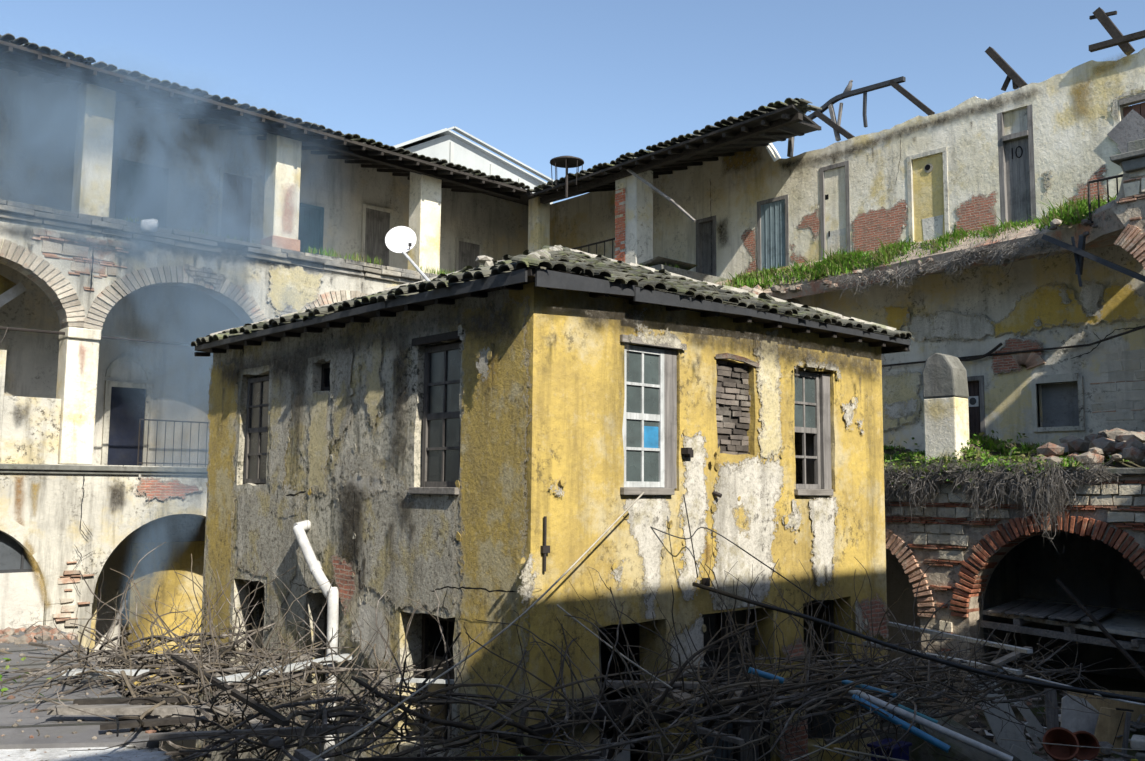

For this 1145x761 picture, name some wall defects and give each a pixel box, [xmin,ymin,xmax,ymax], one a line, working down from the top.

flaking render [797,205,820,242]
flaking render [851,199,908,253]
flaking render [954,189,998,233]
flaking render [628,325,687,355]
peeling [363,333,385,434]
flaking render [133,474,204,502]
damp [341,484,365,578]
peeling [329,444,461,668]
peeling [607,330,842,681]